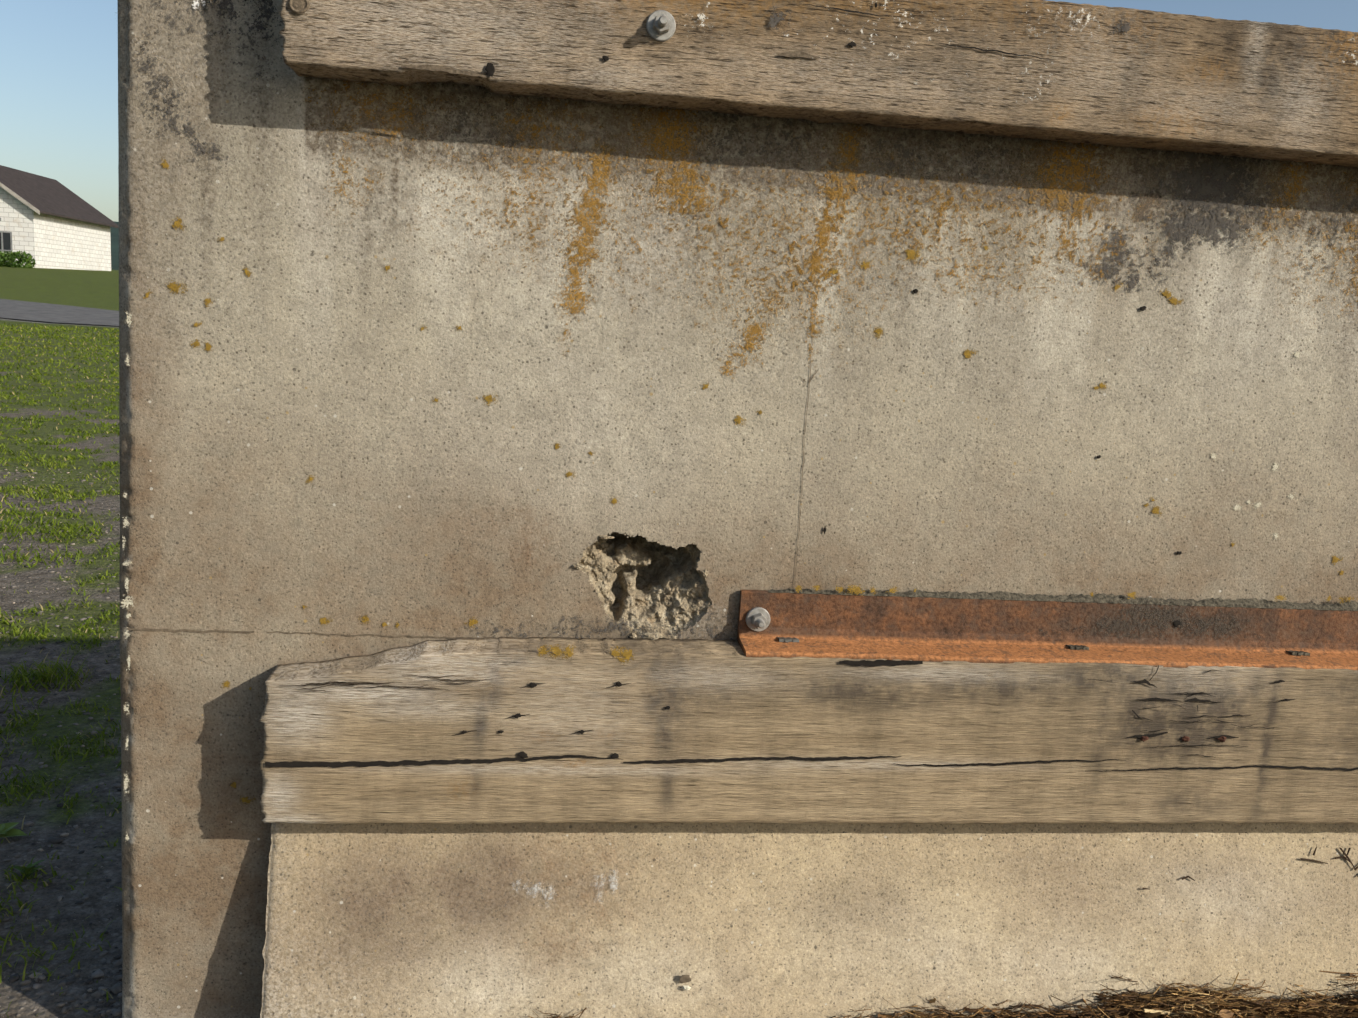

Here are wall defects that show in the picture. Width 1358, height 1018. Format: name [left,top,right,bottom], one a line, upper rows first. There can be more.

spalling [571,532,712,640]
crack [793,293,818,589]